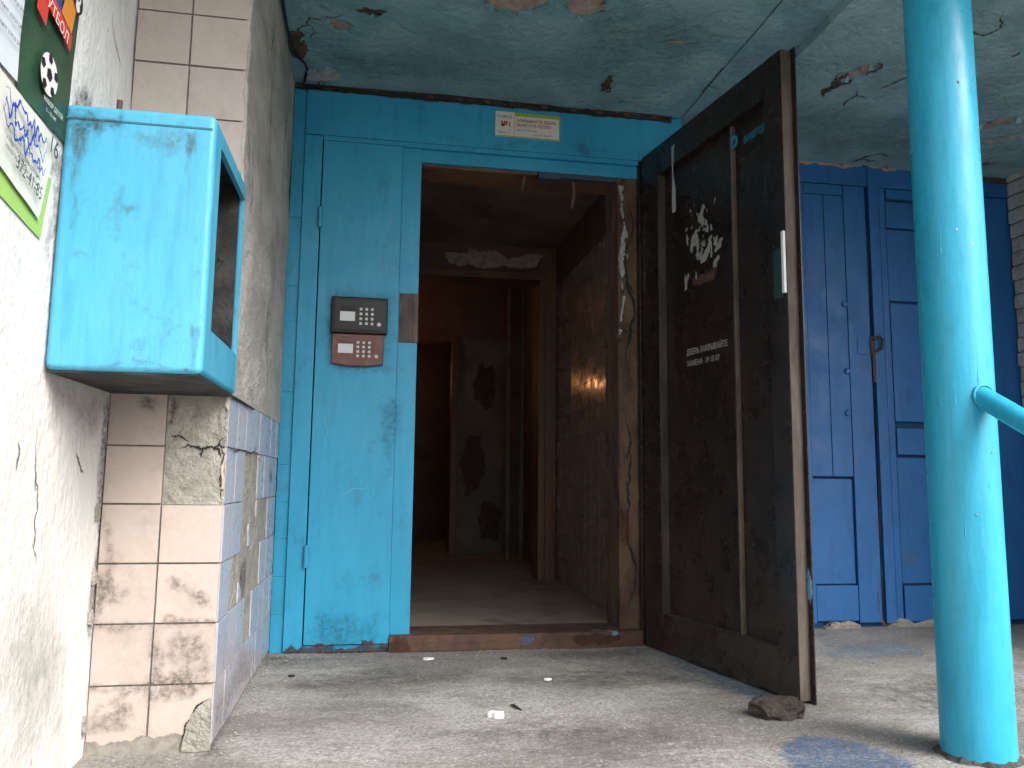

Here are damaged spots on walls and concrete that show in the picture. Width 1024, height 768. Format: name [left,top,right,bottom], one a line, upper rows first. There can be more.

peeling [355,7,387,20]
peeling [484,0,550,17]
peeling [287,31,345,86]
peeling [821,64,880,96]
peeling [445,248,543,269]
peeling [615,178,634,341]
crack [16,423,38,562]
peeling [162,395,229,505]
crack [172,435,260,499]
crack [624,416,637,605]
peeling [228,451,267,646]
rust [285,636,412,654]